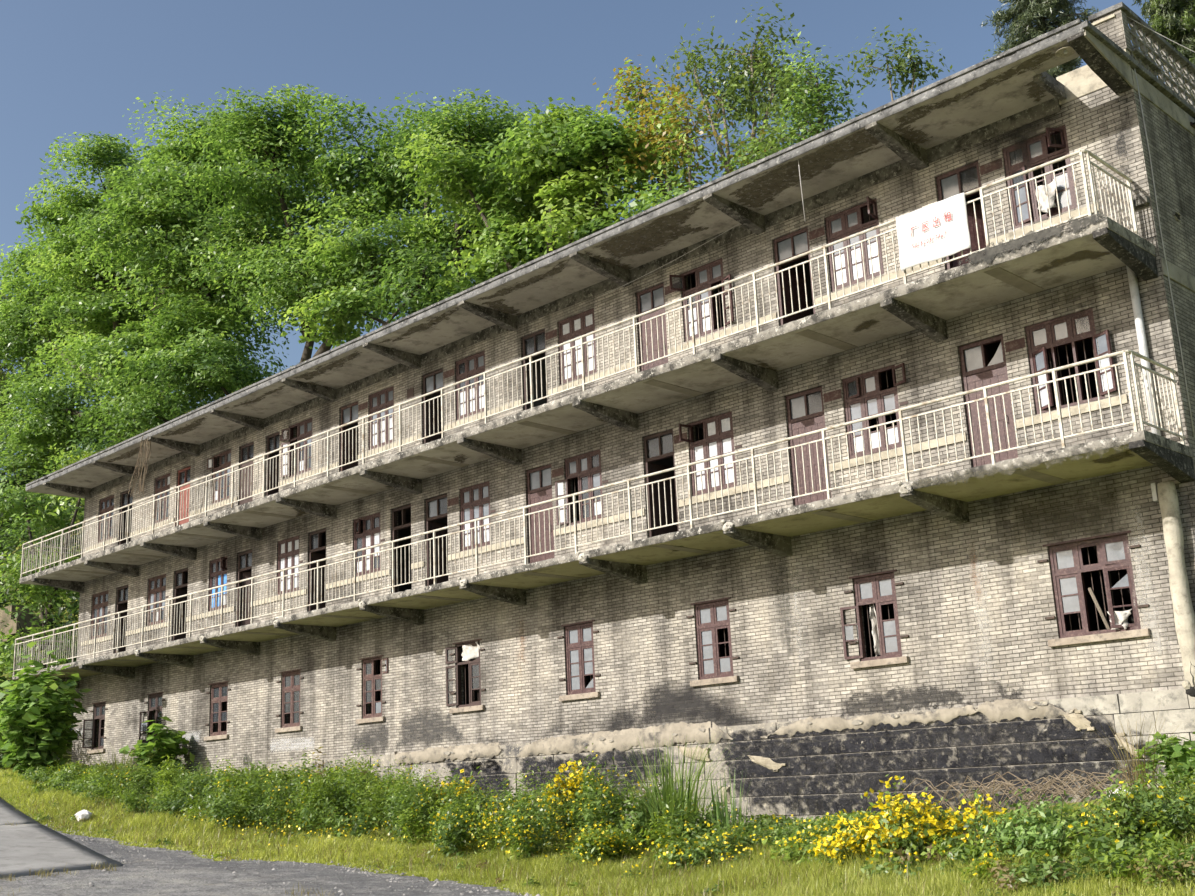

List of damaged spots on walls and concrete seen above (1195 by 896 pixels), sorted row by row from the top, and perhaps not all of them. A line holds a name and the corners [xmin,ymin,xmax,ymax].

peeling [760,699,1095,739]
peeling [394,742,501,764]
peeling [518,721,733,761]
spalling [748,755,786,772]
damp [719,682,1165,816]